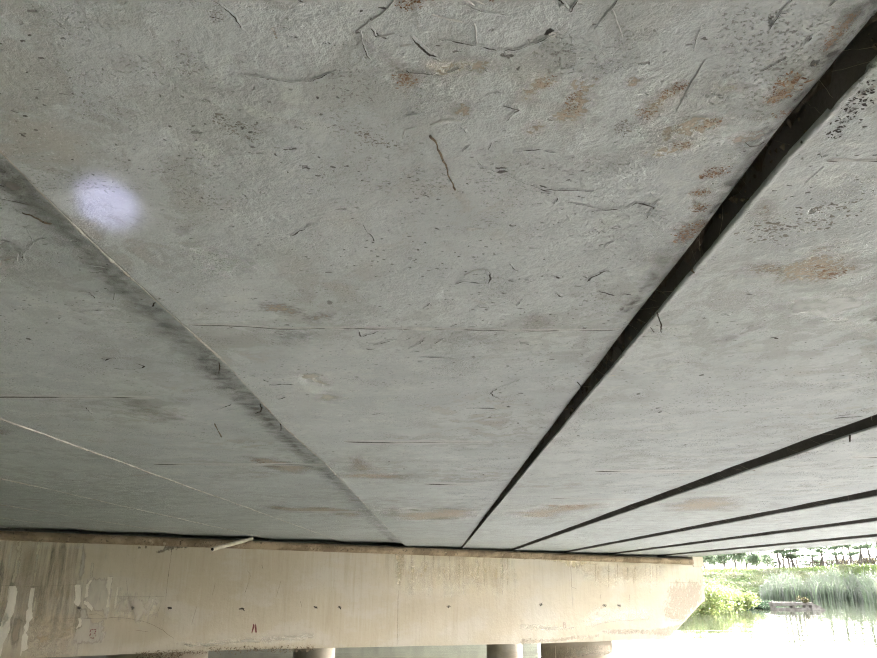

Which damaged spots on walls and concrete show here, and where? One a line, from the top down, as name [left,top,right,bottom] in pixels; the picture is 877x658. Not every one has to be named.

crack [210,0,249,35]
crack [557,0,579,13]
crack [594,0,623,38]
crack [768,0,793,31]
corrosion [635,80,689,120]
corrosion [729,71,814,143]
corrosion [671,165,733,243]
corrosion [754,255,855,282]